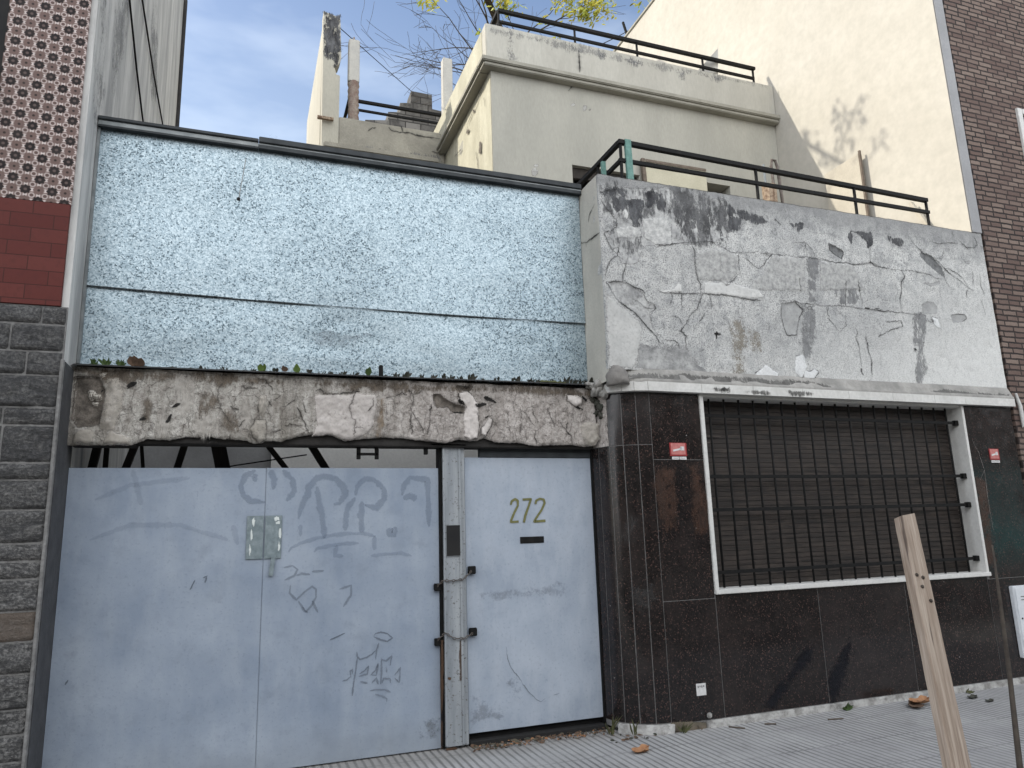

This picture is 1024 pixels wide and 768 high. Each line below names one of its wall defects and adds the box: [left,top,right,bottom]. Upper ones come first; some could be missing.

damp [323,11,341,67]
peeling [603,186,805,336]
crack [581,190,986,375]
damp [801,257,821,358]
flaking render [920,252,943,286]
peeling [795,355,819,378]
damp [912,312,934,383]
flaking render [71,373,130,444]
crack [217,378,432,434]
peeling [312,392,377,439]
peeling [433,386,496,440]
peeling [566,394,587,410]